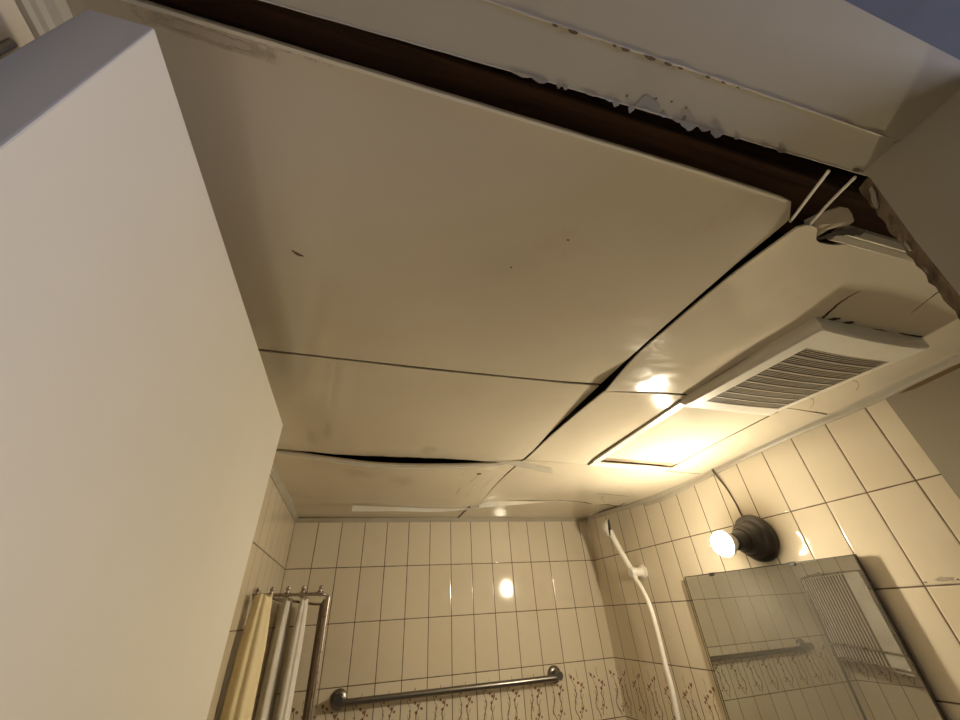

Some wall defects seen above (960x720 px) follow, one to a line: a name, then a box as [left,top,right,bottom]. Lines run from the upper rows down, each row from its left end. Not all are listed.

peeling [511,70,569,90]
peeling [584,91,740,140]
spalling [858,177,960,320]